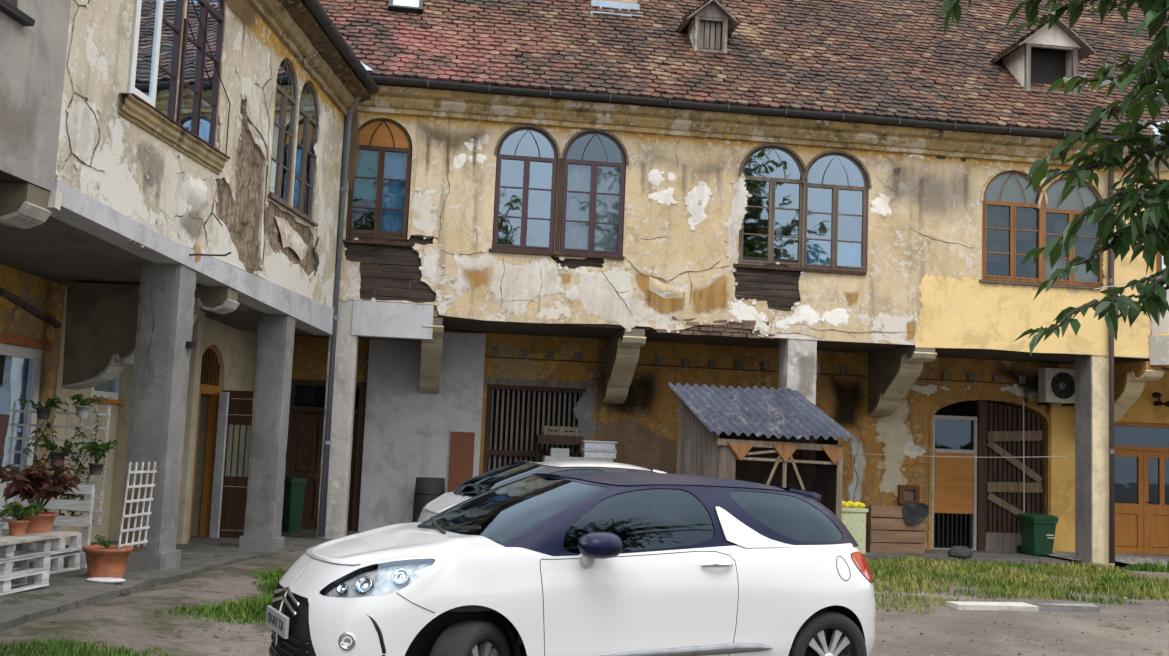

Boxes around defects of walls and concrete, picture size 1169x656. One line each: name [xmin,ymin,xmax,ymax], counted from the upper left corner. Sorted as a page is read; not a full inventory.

crack [63,0,104,172]
peeling [128,148,197,247]
spalling [215,66,332,281]
peeling [453,134,489,169]
peeling [869,183,906,217]
peeling [342,169,850,339]
leakage [833,380,861,426]
leakage [848,441,866,502]
peeling [875,384,970,500]
peeling [986,384,1038,400]